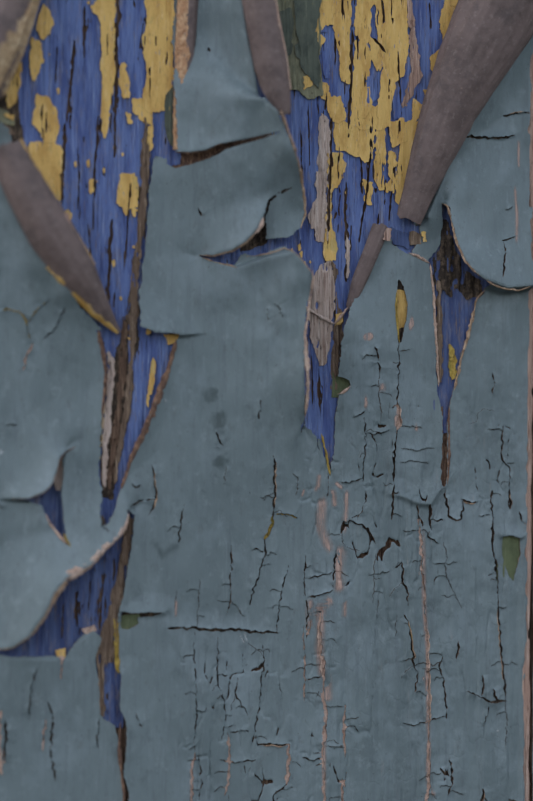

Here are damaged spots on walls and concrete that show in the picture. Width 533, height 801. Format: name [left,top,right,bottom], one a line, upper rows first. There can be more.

peeling [0,0,533,530]
peeling [12,447,74,547]
peeling [323,534,343,590]
crack [168,340,522,801]
peeling [496,536,520,584]
peeling [0,510,160,801]
crack [0,711,8,775]
crack [28,669,56,778]